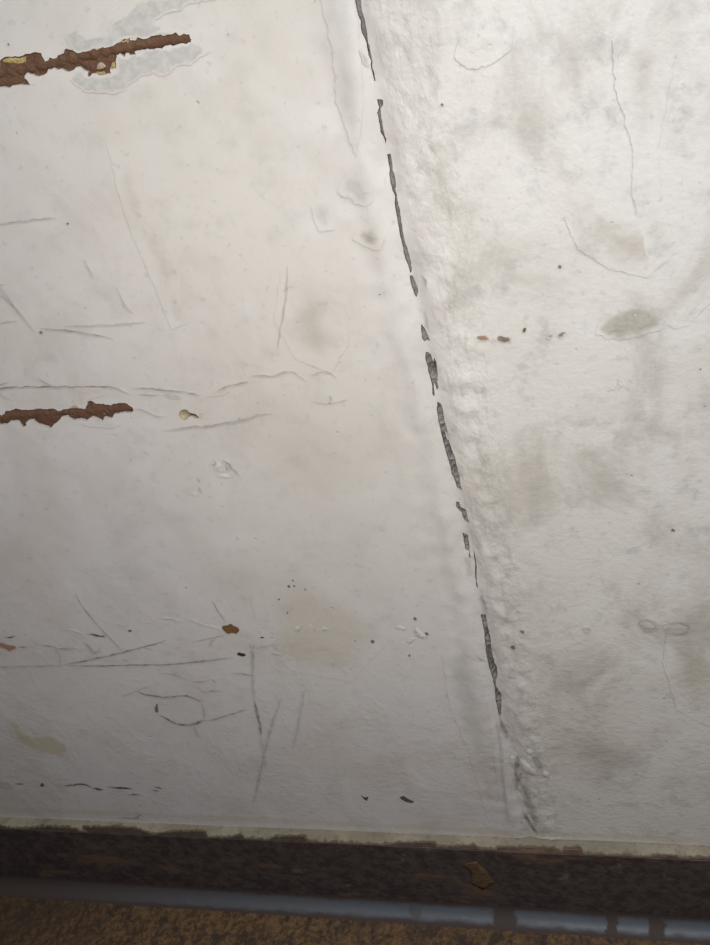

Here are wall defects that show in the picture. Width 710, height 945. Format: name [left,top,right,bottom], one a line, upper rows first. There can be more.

crack [355,0,538,835]
water stain [596,304,665,340]